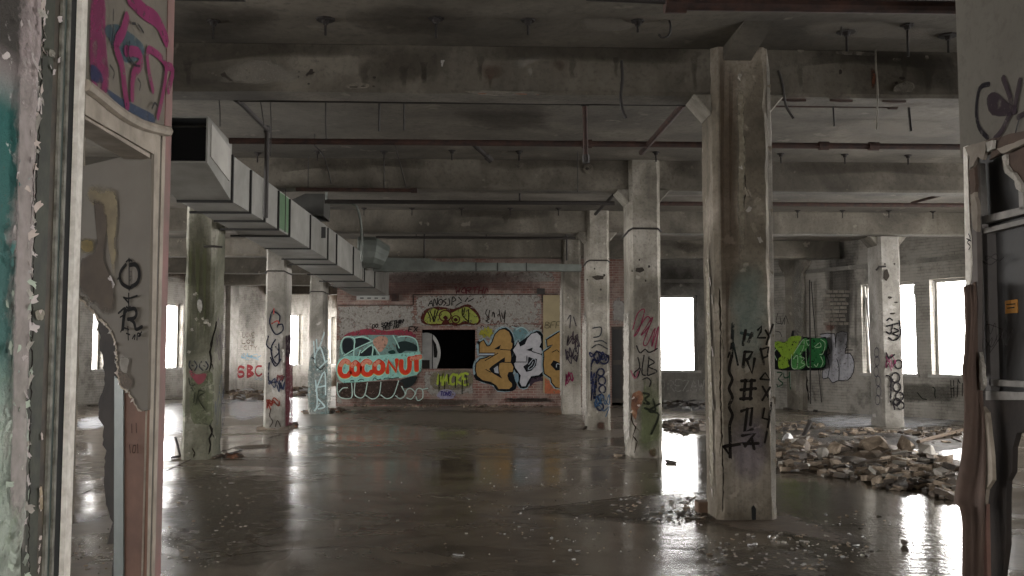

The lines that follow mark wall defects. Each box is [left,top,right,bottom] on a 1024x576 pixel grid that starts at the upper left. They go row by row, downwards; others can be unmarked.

peeling [3,0,63,576]
spalling [79,297,142,412]